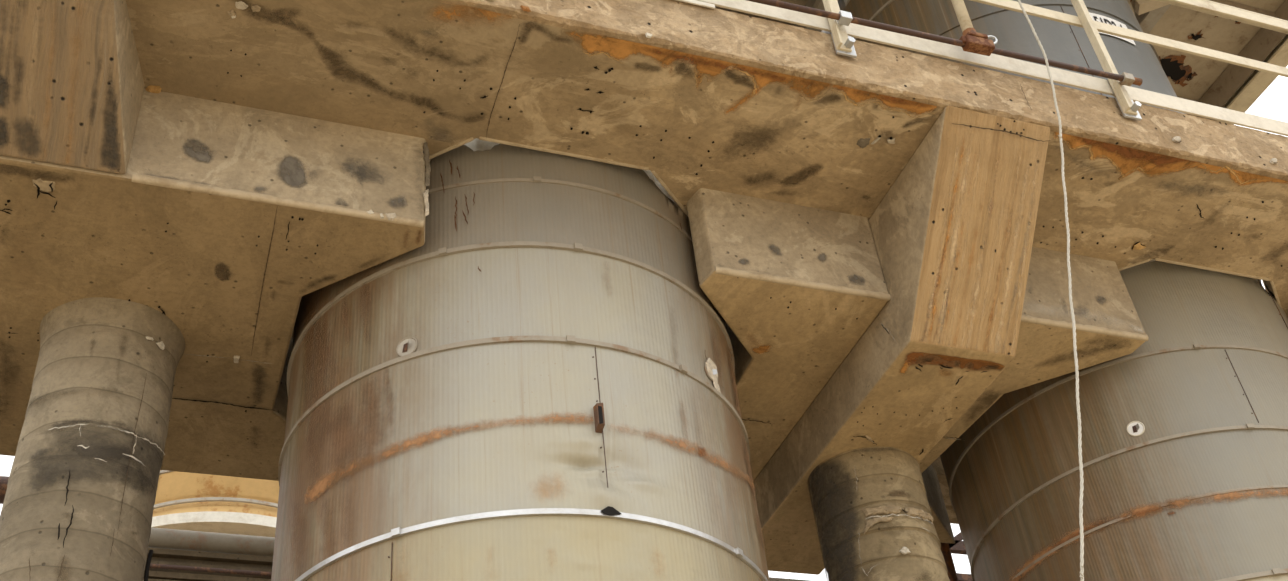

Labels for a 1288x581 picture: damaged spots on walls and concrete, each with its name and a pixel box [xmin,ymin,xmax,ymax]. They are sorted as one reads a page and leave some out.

water stain [0,65,38,151]
water stain [85,90,119,168]
water stain [183,140,211,162]
water stain [279,156,306,187]
water stain [240,0,438,111]
rust [570,31,937,115]
rust [1054,132,1288,185]
rust [900,352,1004,373]
water stain [33,423,165,484]
rust [305,414,593,502]
rust [649,433,754,487]
rust [1011,489,1288,581]